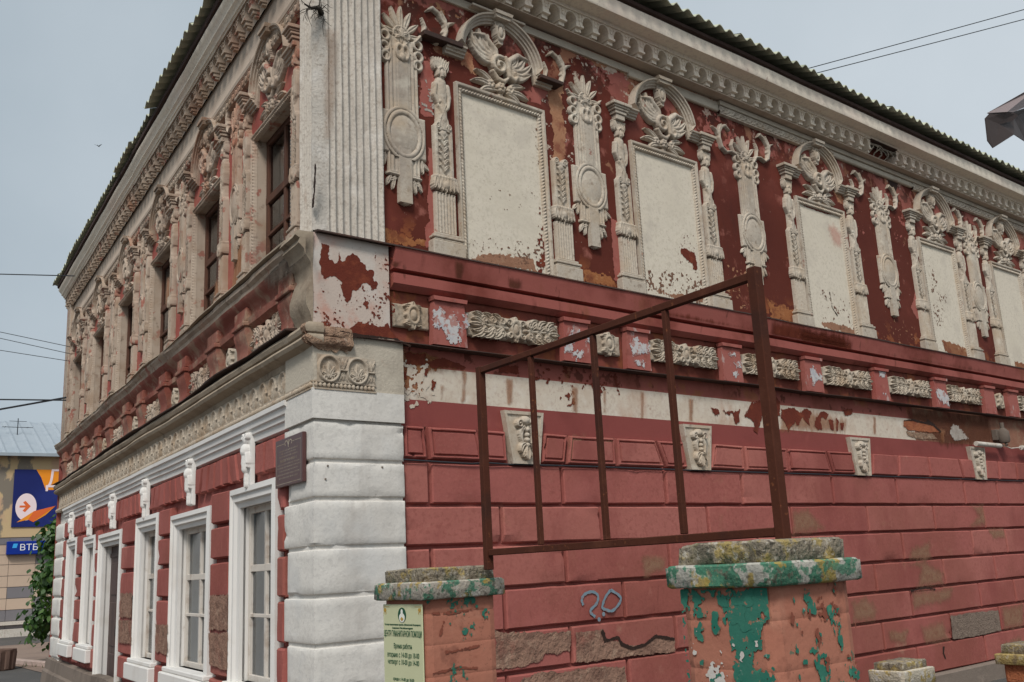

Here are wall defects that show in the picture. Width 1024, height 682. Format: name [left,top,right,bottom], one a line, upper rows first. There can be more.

peeling [645,234,703,304]
peeling [314,243,398,341]
peeling [432,307,470,344]
peeling [403,351,466,408]
peeling [499,365,519,375]
peeling [711,400,762,434]
peeling [776,397,853,431]
spalling [903,421,969,441]
peeling [447,597,489,639]
crack [601,629,675,650]
peeling [495,582,860,682]